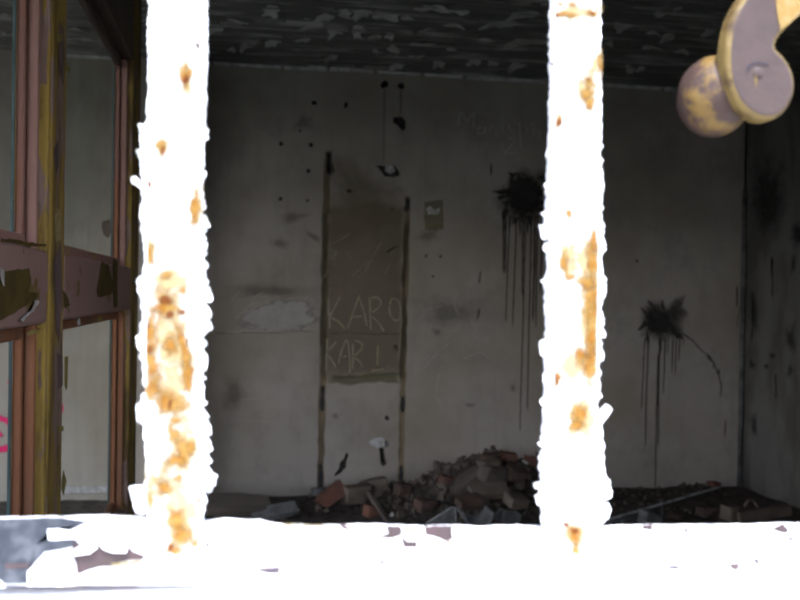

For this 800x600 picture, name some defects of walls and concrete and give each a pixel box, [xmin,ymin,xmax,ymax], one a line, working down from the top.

corrosion [178,62,193,98]
flaking render [261,5,470,89]
corrosion [574,51,602,112]
peeling [1,238,46,248]
corrosion [189,180,203,235]
peeling [0,269,38,321]
peeling [54,242,70,341]
leakage [493,172,546,428]
corrosion [554,228,599,459]
corrosion [145,236,200,567]
leakage [638,298,722,488]
peeling [0,517,145,588]